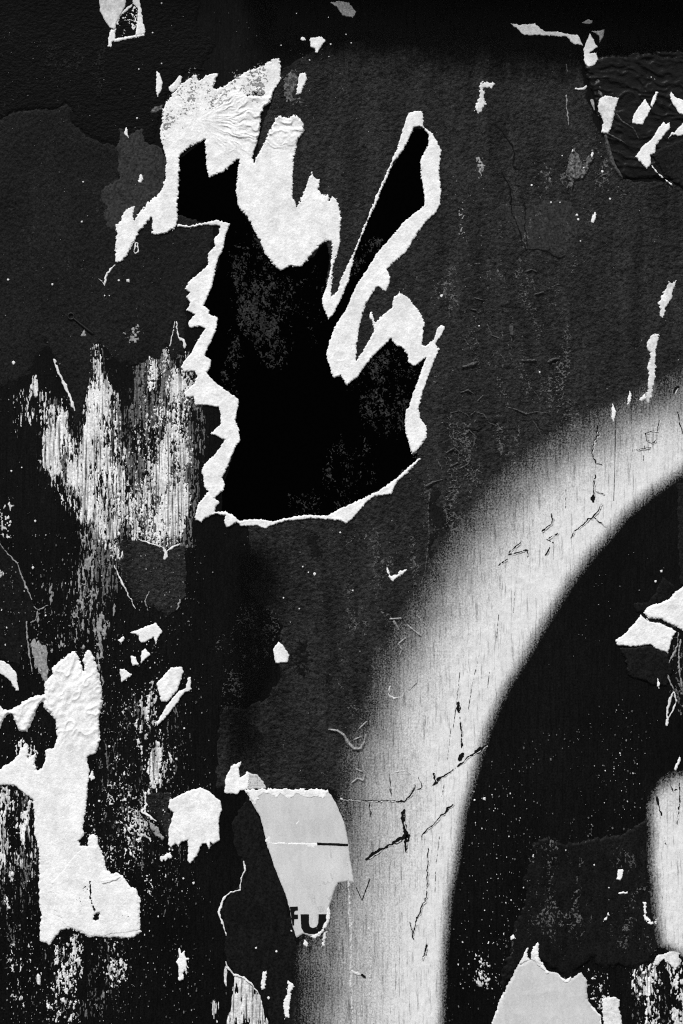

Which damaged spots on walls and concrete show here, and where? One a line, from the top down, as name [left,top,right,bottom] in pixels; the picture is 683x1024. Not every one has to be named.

crack [498,386,683,566]
peeling [0,343,197,1024]
crack [332,662,490,961]
peeling [672,625,683,715]